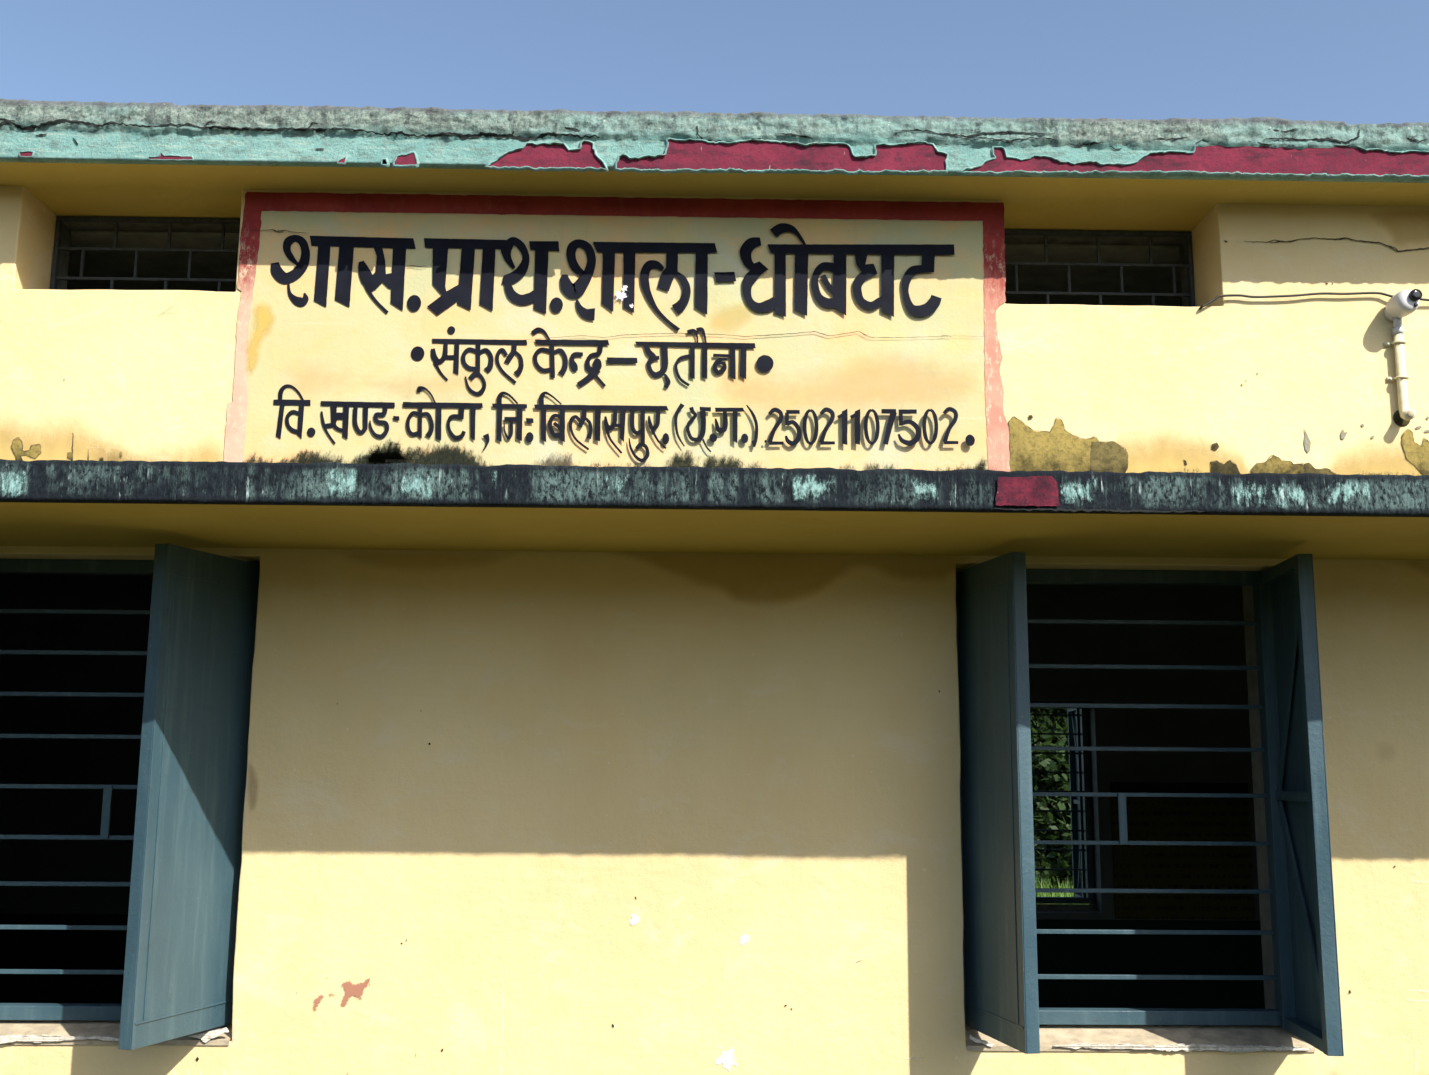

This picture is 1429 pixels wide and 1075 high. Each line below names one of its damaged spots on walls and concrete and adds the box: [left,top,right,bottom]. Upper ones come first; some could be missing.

peeling [19,151,35,159]
peeling [147,152,194,162]
peeling [380,151,420,168]
peeling [484,138,1429,179]
crack [1244,237,1429,252]
water stain [0,430,118,461]
water stain [189,451,217,462]
water stain [246,440,493,467]
water stain [668,451,761,468]
water stain [1125,442,1247,474]
water stain [1333,456,1422,476]
peeling [313,978,370,1010]